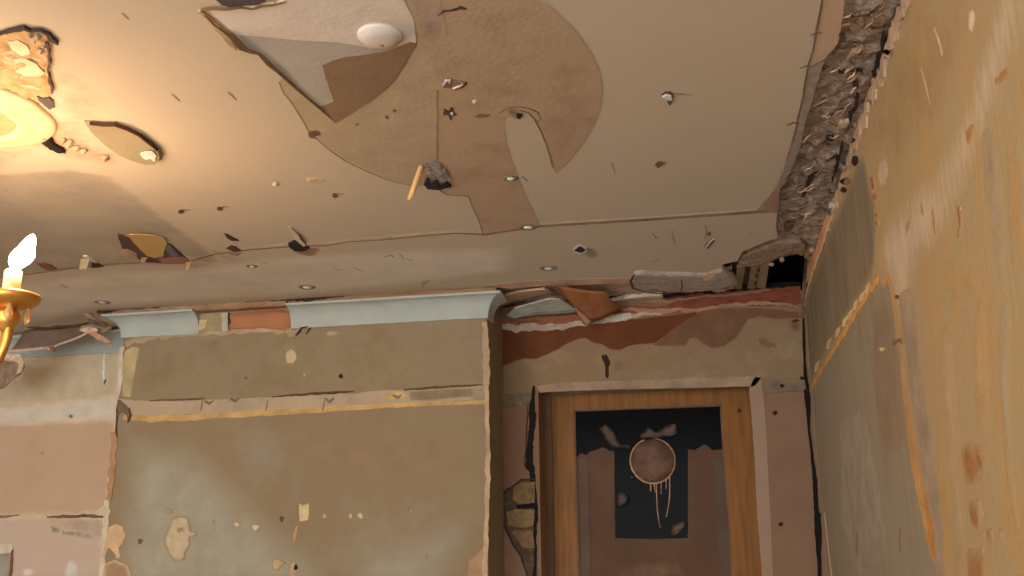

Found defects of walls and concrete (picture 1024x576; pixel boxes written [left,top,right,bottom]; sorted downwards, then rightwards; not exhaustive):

spalling [42,137,88,155]
peeling [84,120,160,165]
spalling [117,233,192,271]
peeling [205,0,602,234]
peeling [485,0,937,576]
peeling [0,300,484,576]
crack [523,386,538,576]
crack [620,280,832,576]